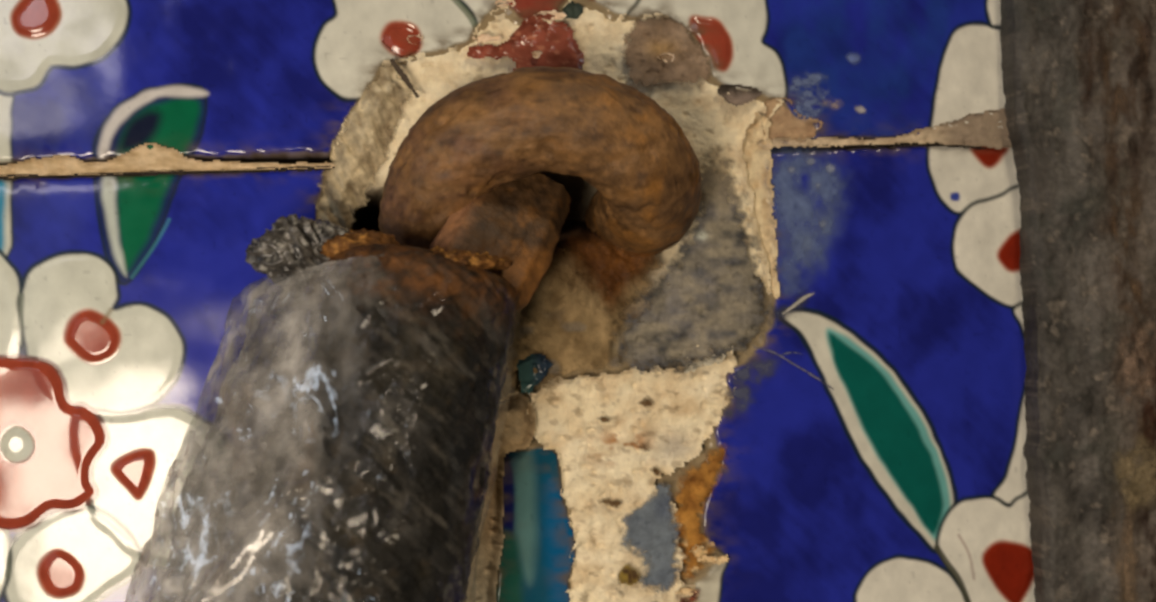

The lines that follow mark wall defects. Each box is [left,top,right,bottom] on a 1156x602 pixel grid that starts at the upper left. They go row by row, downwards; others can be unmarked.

crack [0,166,335,180]
spalling [347,0,823,322]
crack [815,142,986,150]
rust [319,228,400,258]
rust [429,246,513,273]
spalling [527,345,737,602]
rust [674,448,729,596]